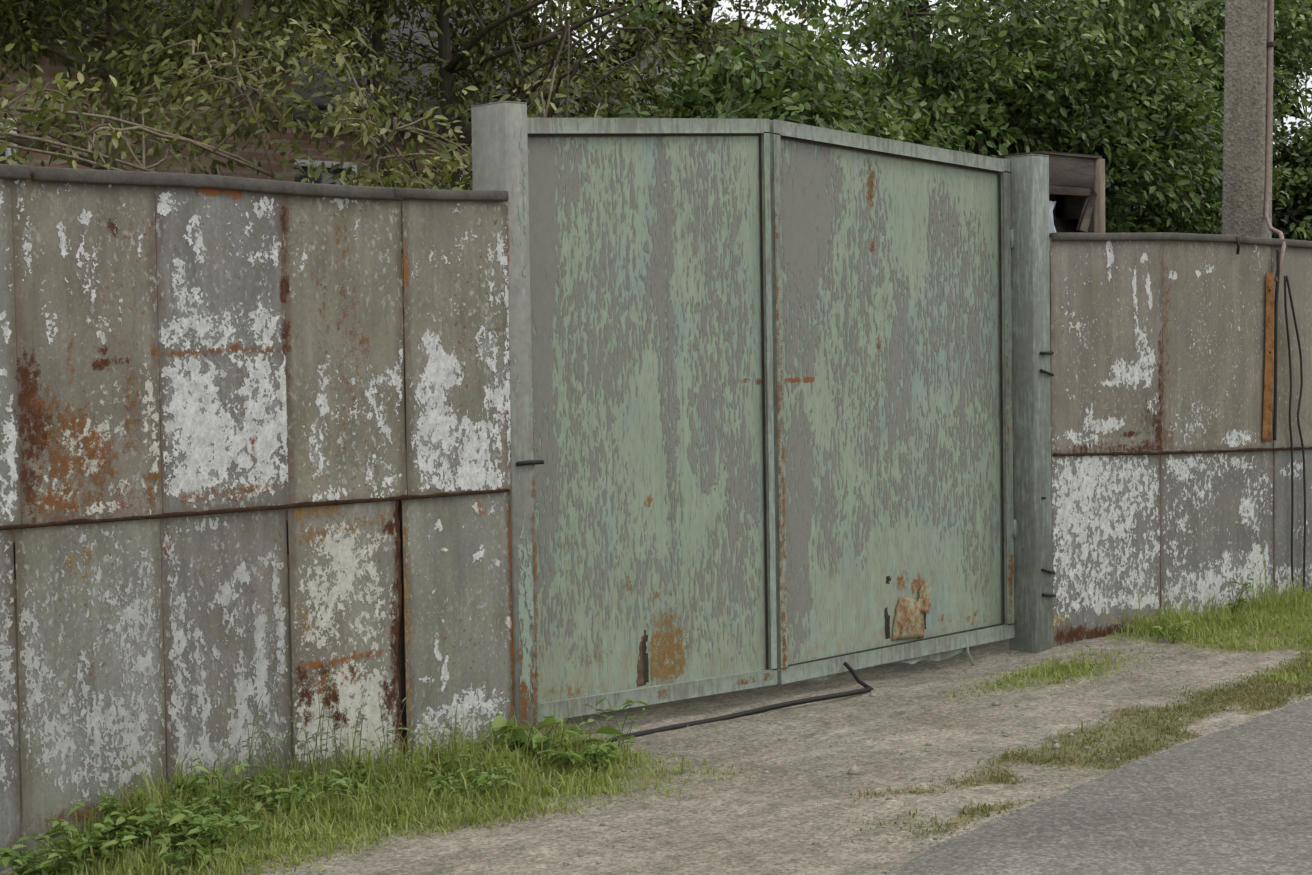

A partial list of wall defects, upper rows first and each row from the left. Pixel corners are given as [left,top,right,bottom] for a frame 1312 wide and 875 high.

rust [14,270,162,530]
rust [152,319,292,392]
rust [177,482,284,503]
rust [293,505,413,763]
peeling [0,127,762,806]
rust [648,592,687,699]
peeling [781,139,1001,663]
rust [897,573,926,594]
peeling [1052,241,1312,619]